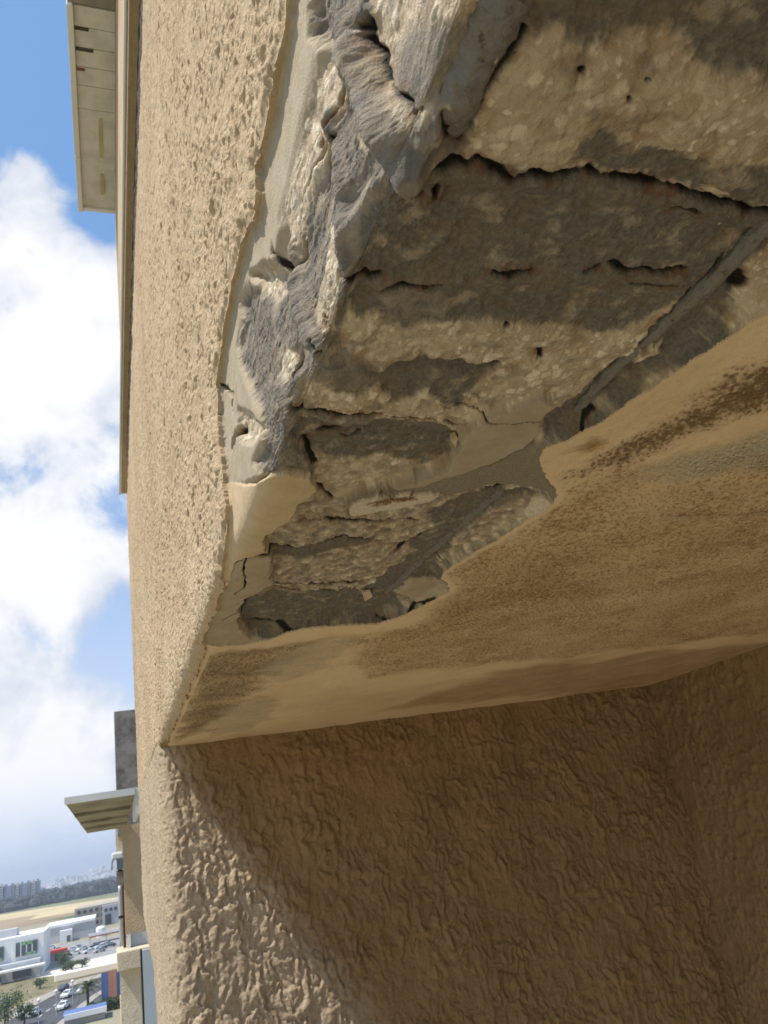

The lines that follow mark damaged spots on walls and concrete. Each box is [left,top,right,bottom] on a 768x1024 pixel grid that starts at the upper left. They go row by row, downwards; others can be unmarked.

spalling [203,0,768,646]
rust [369,490,416,508]
water stain [349,364,768,689]
crack [223,558,248,620]
water stain [177,642,315,739]